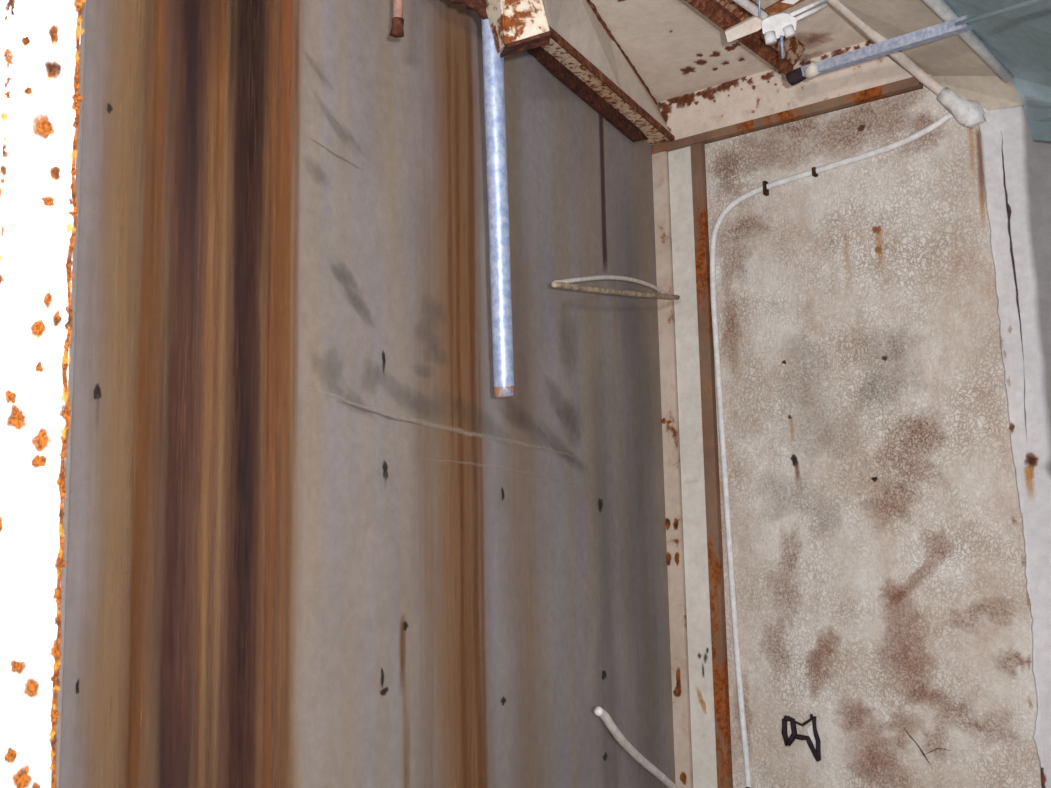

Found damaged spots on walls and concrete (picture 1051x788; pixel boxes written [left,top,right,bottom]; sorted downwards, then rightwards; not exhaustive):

rust [1,40,13,122]
rust [680,43,744,74]
rust [658,71,782,131]
rust [800,38,871,66]
rust [0,136,9,203]
rust [4,0,85,788]
rust [93,0,298,788]
rust [1025,453,1038,491]
rust [673,669,681,697]